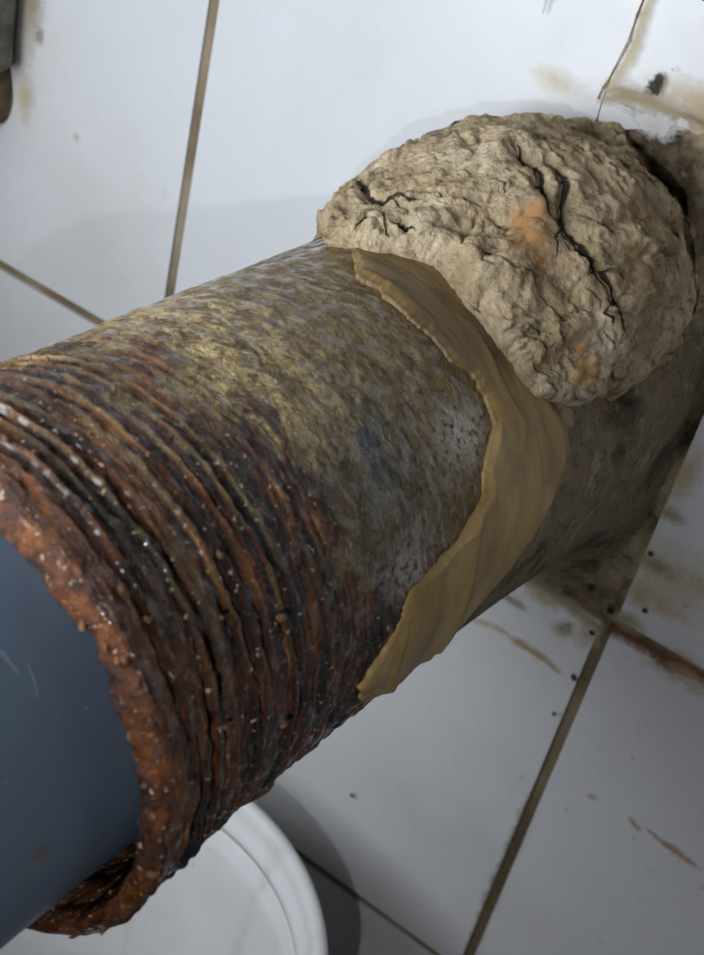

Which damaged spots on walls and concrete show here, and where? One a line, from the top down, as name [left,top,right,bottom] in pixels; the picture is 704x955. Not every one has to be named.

crack [353,179,417,238]
crack [516,145,623,325]
rust [608,614,704,682]